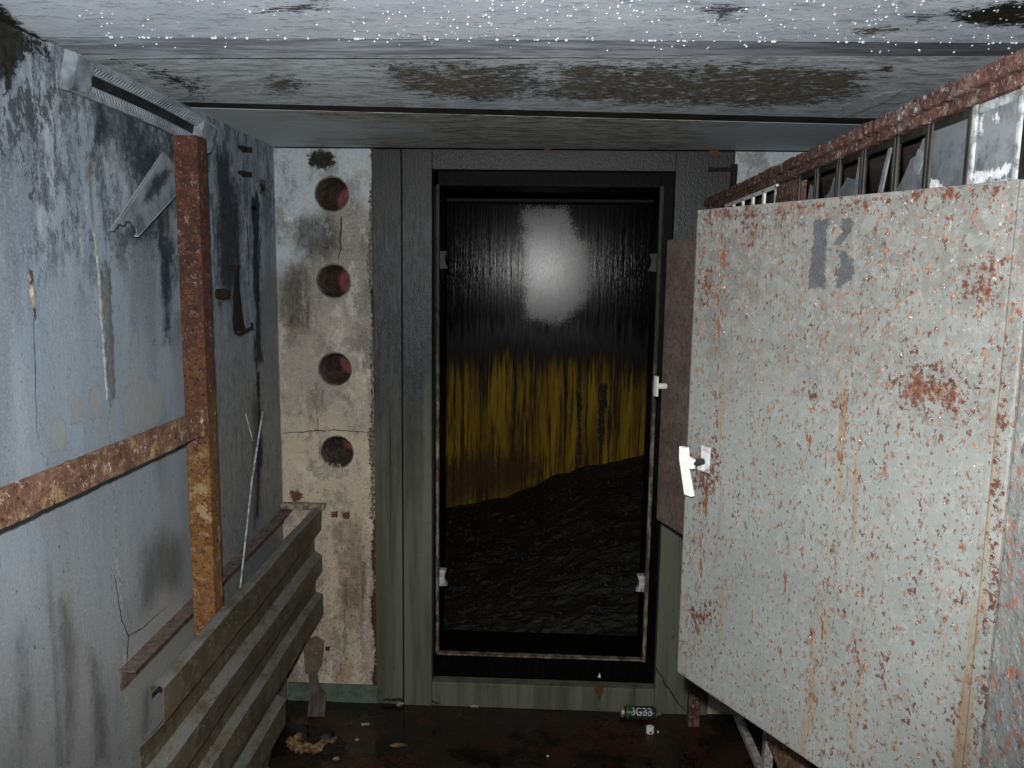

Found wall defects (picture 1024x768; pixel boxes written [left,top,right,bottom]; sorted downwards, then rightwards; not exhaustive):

leakage [851,0,1024,37]
leakage [0,4,57,96]
leakage [368,58,902,118]
leakage [305,149,336,171]
crack [112,477,164,766]